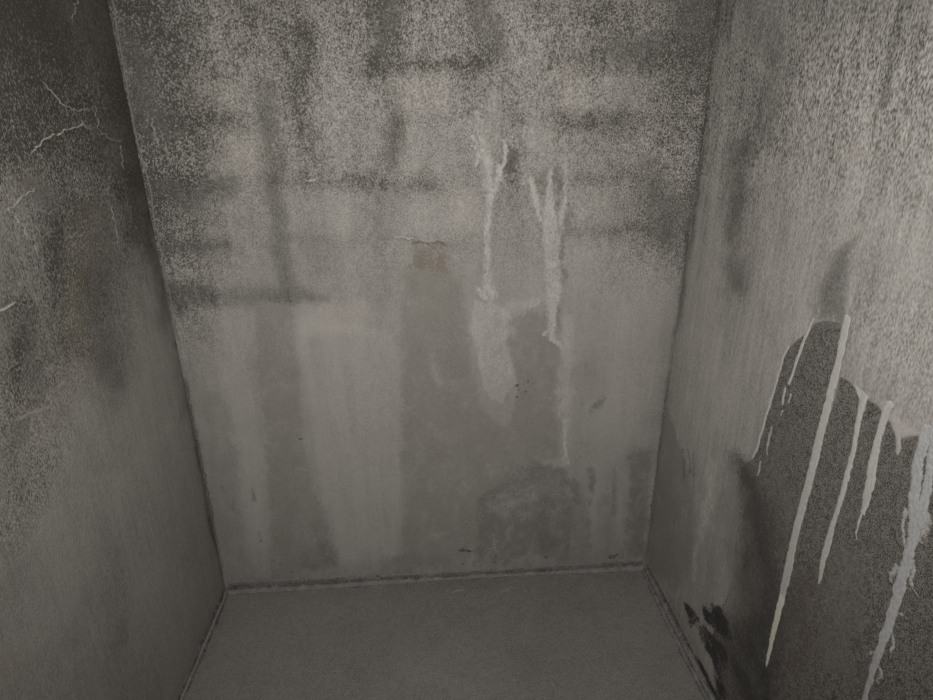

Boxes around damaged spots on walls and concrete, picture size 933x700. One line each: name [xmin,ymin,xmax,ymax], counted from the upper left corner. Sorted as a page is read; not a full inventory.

crack [34,85,124,165]
water stain [399,135,933,700]